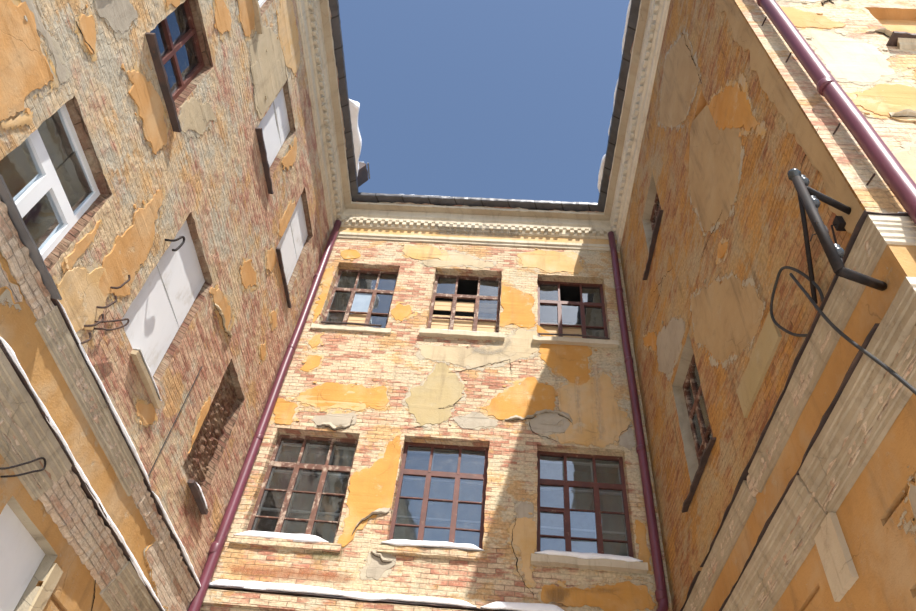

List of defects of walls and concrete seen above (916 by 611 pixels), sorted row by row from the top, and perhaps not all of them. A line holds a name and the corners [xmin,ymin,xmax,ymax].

flaking render [0,0,70,133]
flaking render [72,0,138,62]
flaking render [121,60,217,155]
flaking render [775,0,916,123]
flaking render [53,184,165,340]
flaking render [268,248,390,430]
flaking render [391,301,418,323]
flaking render [401,244,497,269]
flaking render [401,285,635,451]
flaking render [516,248,587,274]
flaking render [337,430,404,547]
flaking render [897,466,916,543]